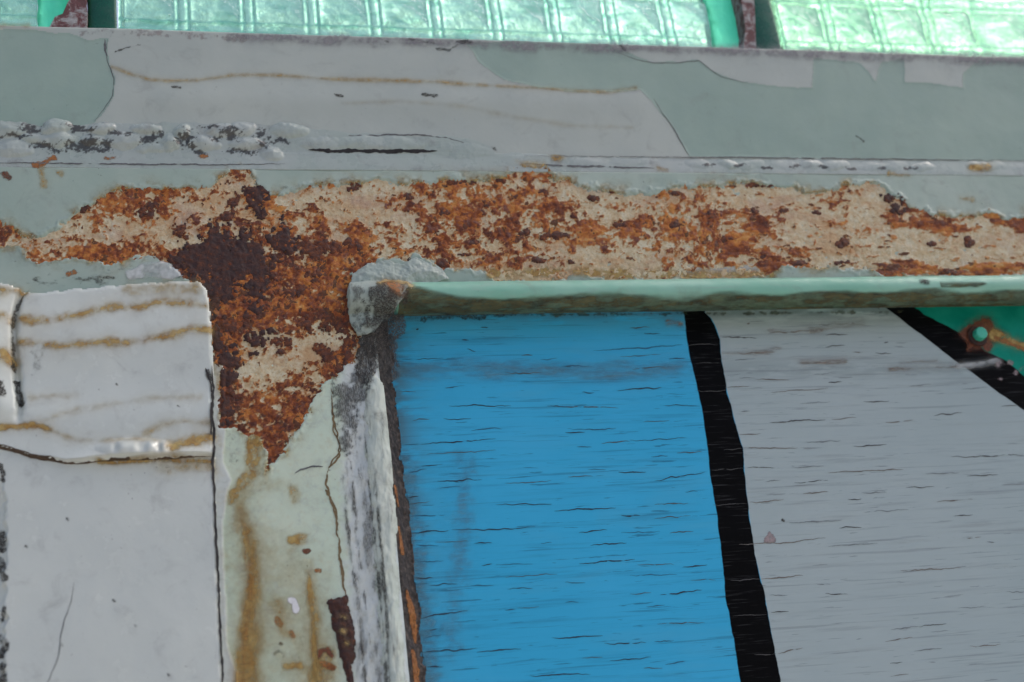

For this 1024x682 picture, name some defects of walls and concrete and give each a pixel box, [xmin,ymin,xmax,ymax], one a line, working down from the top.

crack [310,134,464,154]
peeling [466,41,1024,161]
peeling [126,261,182,279]
rust [0,155,1024,504]
crack [0,368,224,682]
rust [235,527,259,682]
rust [283,569,356,682]
crack [295,390,346,595]
water stain [343,470,390,682]
rust [406,589,420,682]